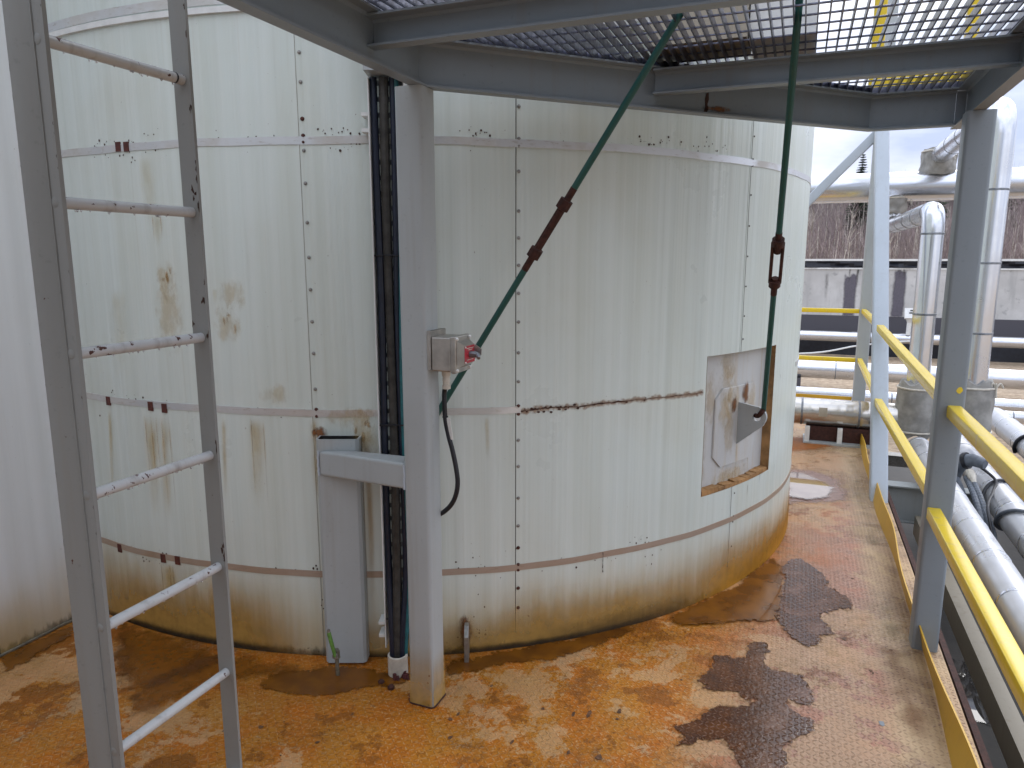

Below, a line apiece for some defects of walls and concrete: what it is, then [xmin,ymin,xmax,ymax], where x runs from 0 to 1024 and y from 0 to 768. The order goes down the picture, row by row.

corrosion [732,383,749,411]
damp [788,470,847,504]
corrosion [698,505,789,602]
peeling [774,558,856,647]
peeling [670,628,821,768]